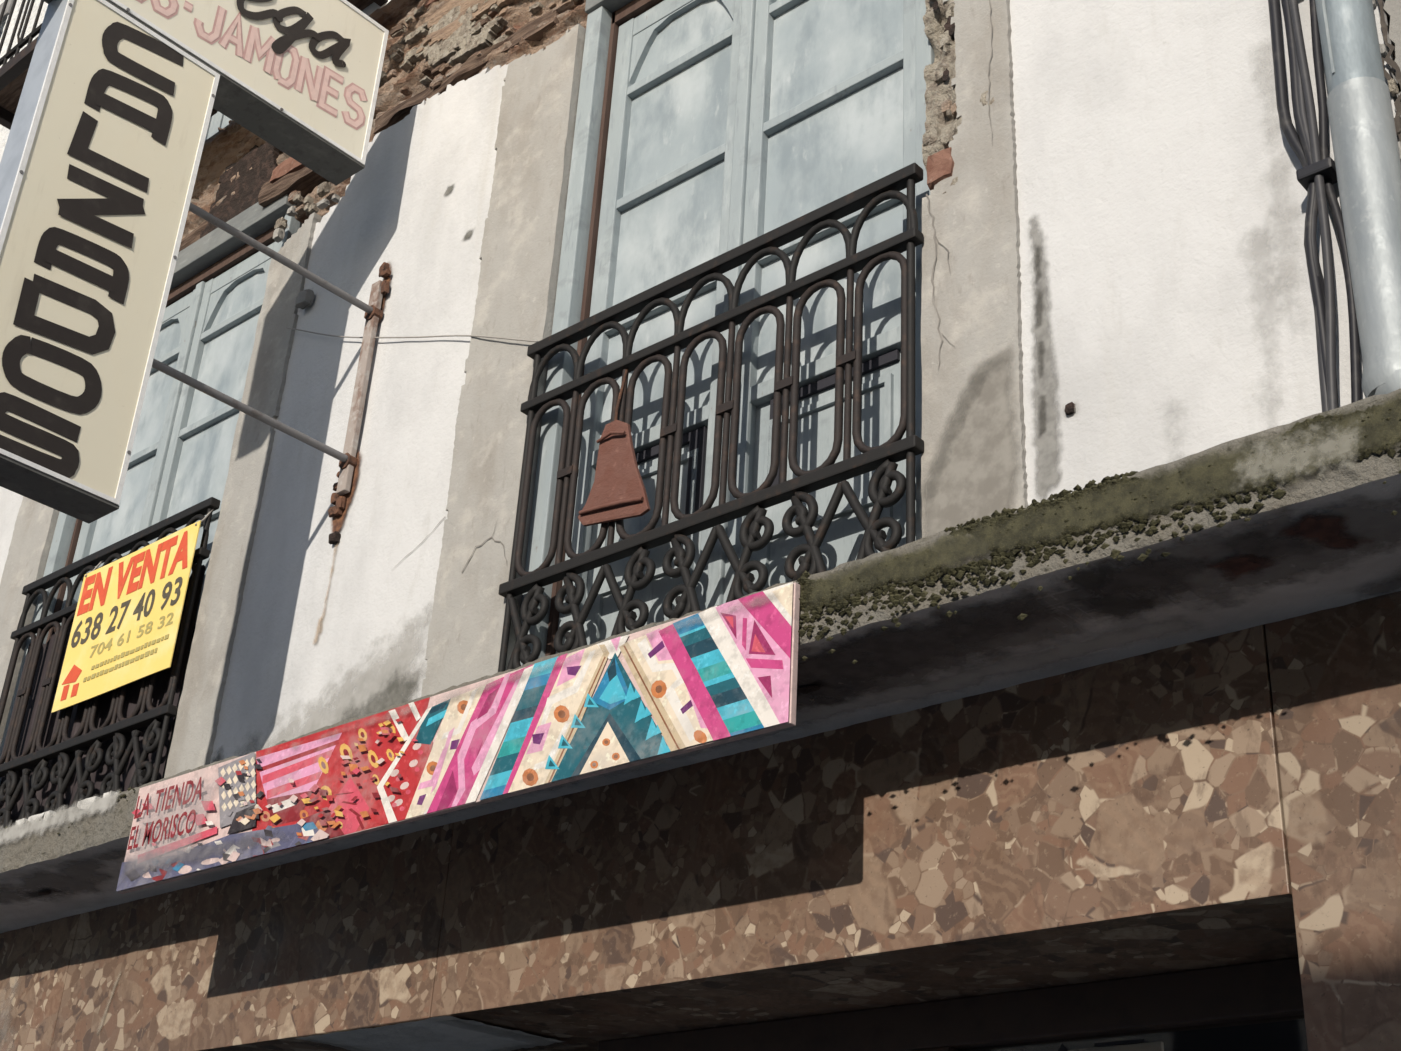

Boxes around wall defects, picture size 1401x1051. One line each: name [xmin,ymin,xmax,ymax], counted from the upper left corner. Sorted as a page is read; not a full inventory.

peeling [369,0,588,142]
spalling [922,0,962,194]
corrosion [379,262,391,310]
corrosion [314,451,360,643]
corrosion [1283,516,1372,549]
water stain [0,851,126,904]